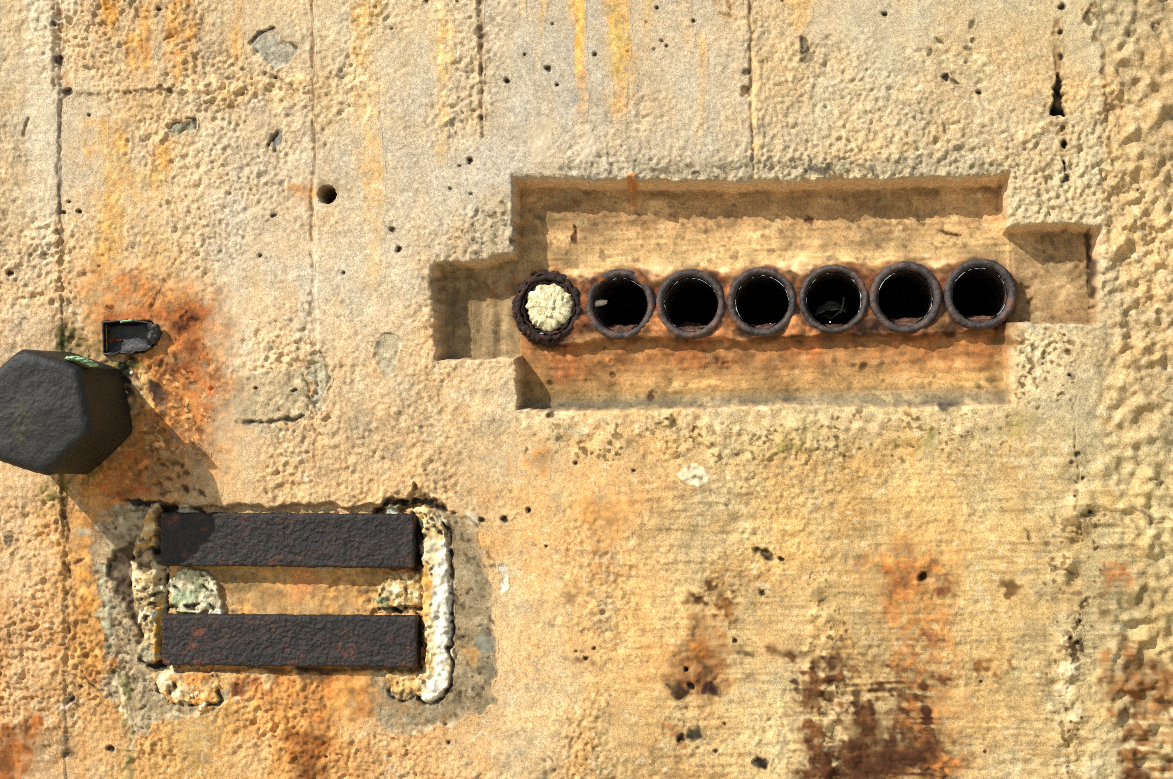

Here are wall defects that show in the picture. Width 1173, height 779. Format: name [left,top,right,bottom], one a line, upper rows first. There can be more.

rust [563,0,654,147]
rust [48,112,261,688]
rust [499,255,1030,394]
leakage [934,323,1022,412]
rust [0,705,49,779]
spalling [104,538,144,646]
spalling [118,496,208,513]
rust [203,566,387,615]
spalling [369,481,510,596]
rust [653,569,749,778]
rust [760,522,999,779]
rust [1074,552,1173,779]